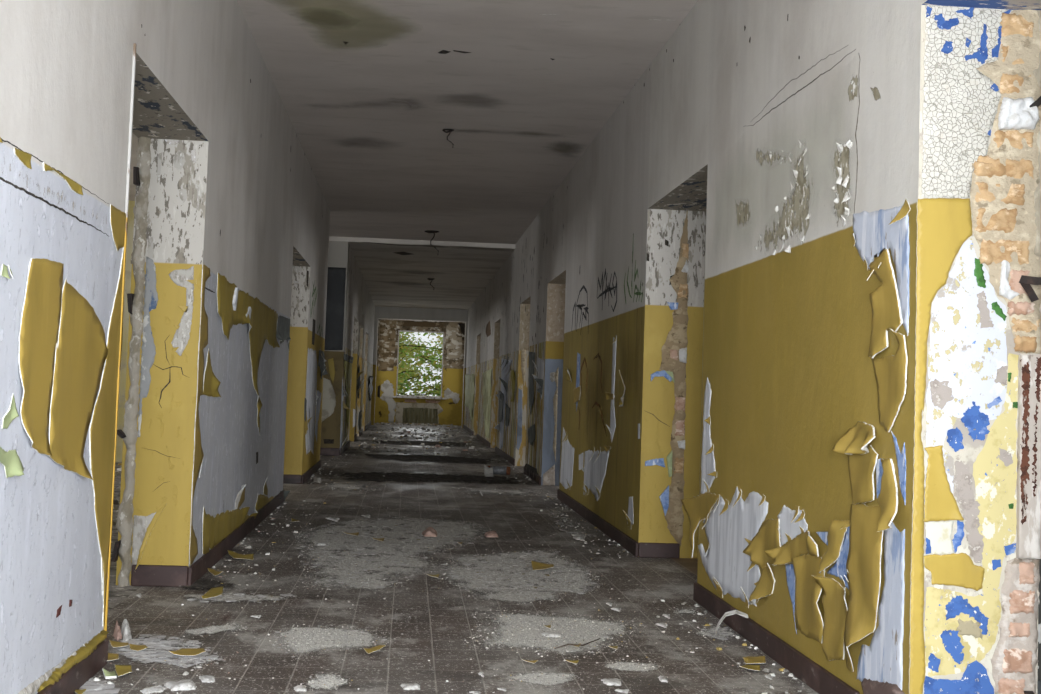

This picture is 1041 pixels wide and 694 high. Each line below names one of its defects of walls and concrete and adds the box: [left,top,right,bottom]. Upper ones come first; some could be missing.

crack [0,177,108,236]
crack [1,138,109,204]
crack [155,336,187,408]
spalling [645,5,1041,694]
peeling [0,137,291,694]
peeling [304,319,625,501]
peeling [623,496,634,529]